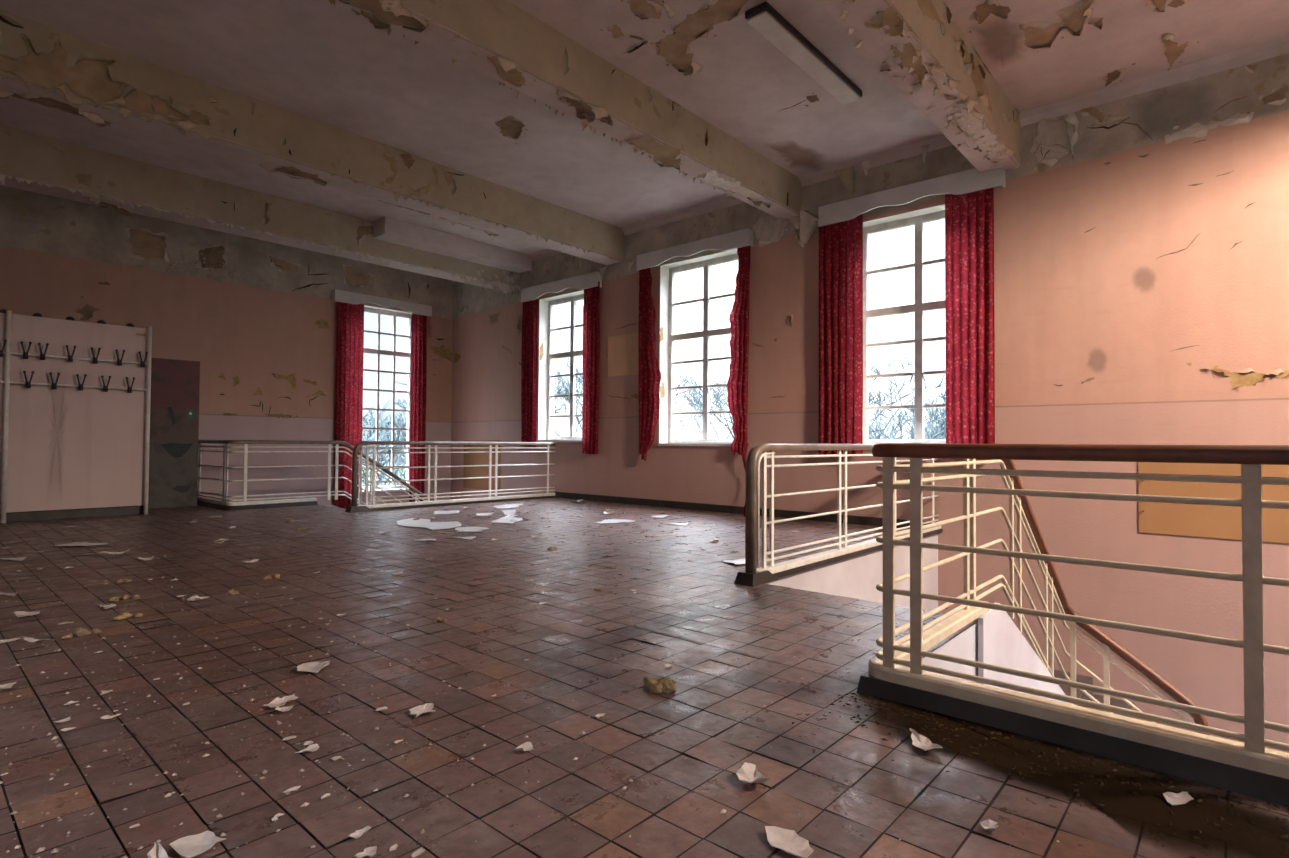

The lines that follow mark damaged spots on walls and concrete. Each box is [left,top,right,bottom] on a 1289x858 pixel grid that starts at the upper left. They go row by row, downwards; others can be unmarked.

peeling [1145,0,1188,13]
peeling [621,0,749,77]
peeling [1161,33,1199,70]
peeling [839,0,1108,172]
peeling [1098,63,1135,87]
peeling [0,89,111,127]
peeling [1164,84,1287,144]
peeling [259,162,335,186]
peeling [195,245,227,272]
crack [1156,234,1199,259]
peeling [1187,363,1289,392]